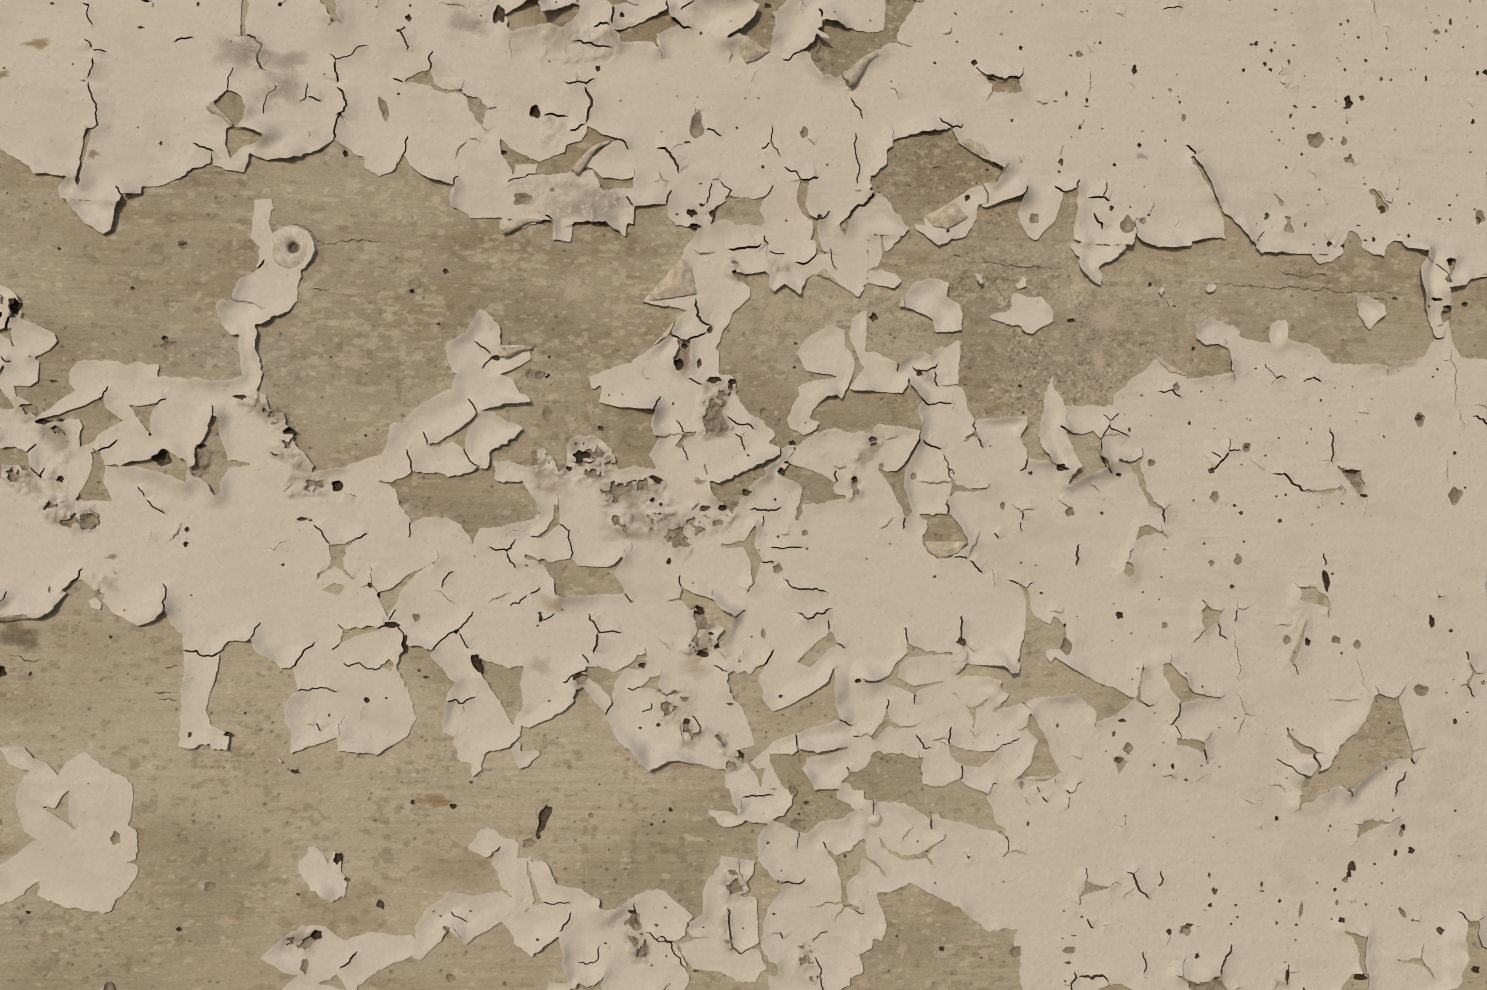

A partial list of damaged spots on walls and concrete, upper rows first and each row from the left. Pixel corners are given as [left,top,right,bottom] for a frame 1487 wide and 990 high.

crack [655,105,721,182]
crack [850,86,863,191]
crack [693,236,785,256]
peeling [0,45,1487,627]
crack [435,524,554,620]
crack [589,614,621,653]
crack [749,507,833,623]
peeling [1283,570,1334,673]
peeling [0,517,1239,990]
peeling [1277,651,1485,811]
peeling [1316,814,1415,990]
peeling [1392,911,1487,990]